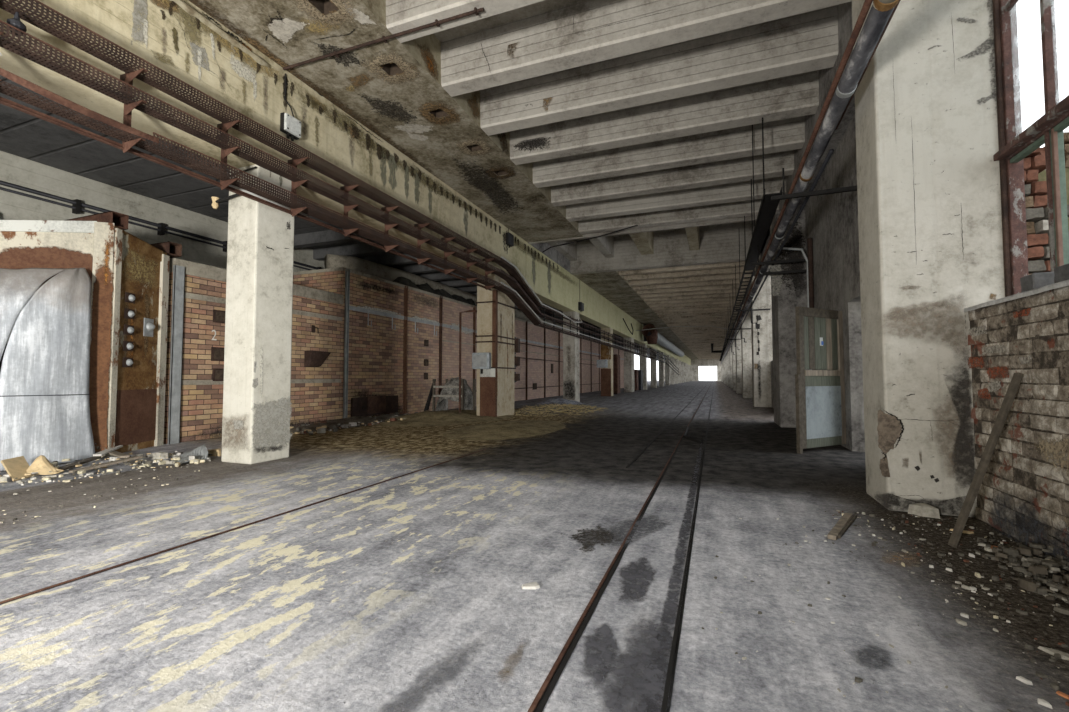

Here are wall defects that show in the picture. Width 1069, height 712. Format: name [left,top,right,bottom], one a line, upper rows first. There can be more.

peeling [131,0,148,48]
leakage [151,0,524,234]
leakage [498,133,551,153]
leakage [514,237,573,292]
corrosion [0,244,114,453]
leakage [887,302,962,345]
spalling [877,410,904,477]